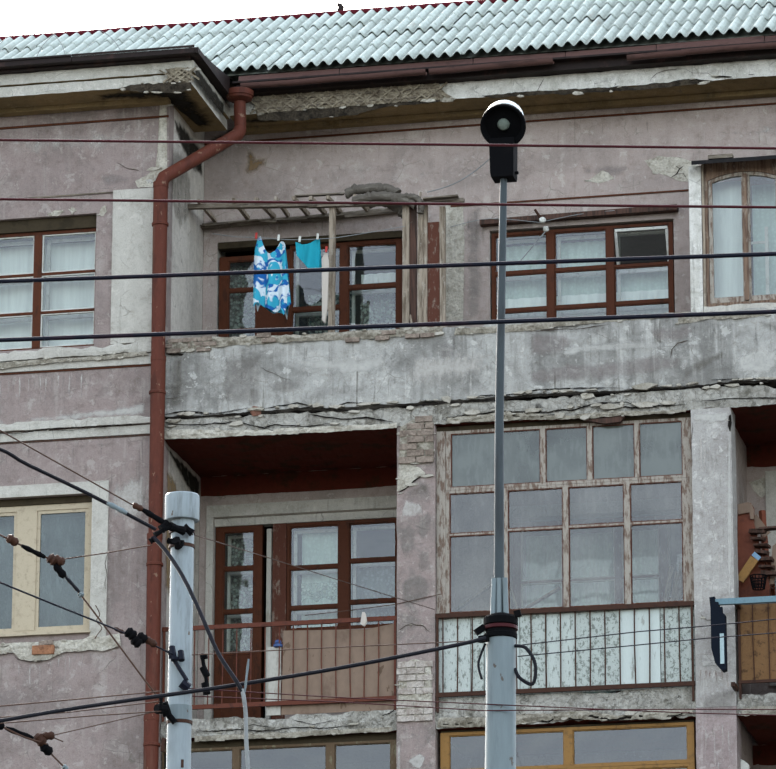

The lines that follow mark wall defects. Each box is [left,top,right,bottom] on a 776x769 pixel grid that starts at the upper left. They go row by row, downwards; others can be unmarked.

spalling [250,82,456,121]
spalling [482,78,714,98]
peeling [644,156,699,182]
spalling [446,409,687,424]
flaking render [165,415,436,492]
spalling [0,633,121,662]
flaking render [195,659,485,742]
spalling [516,710,693,724]